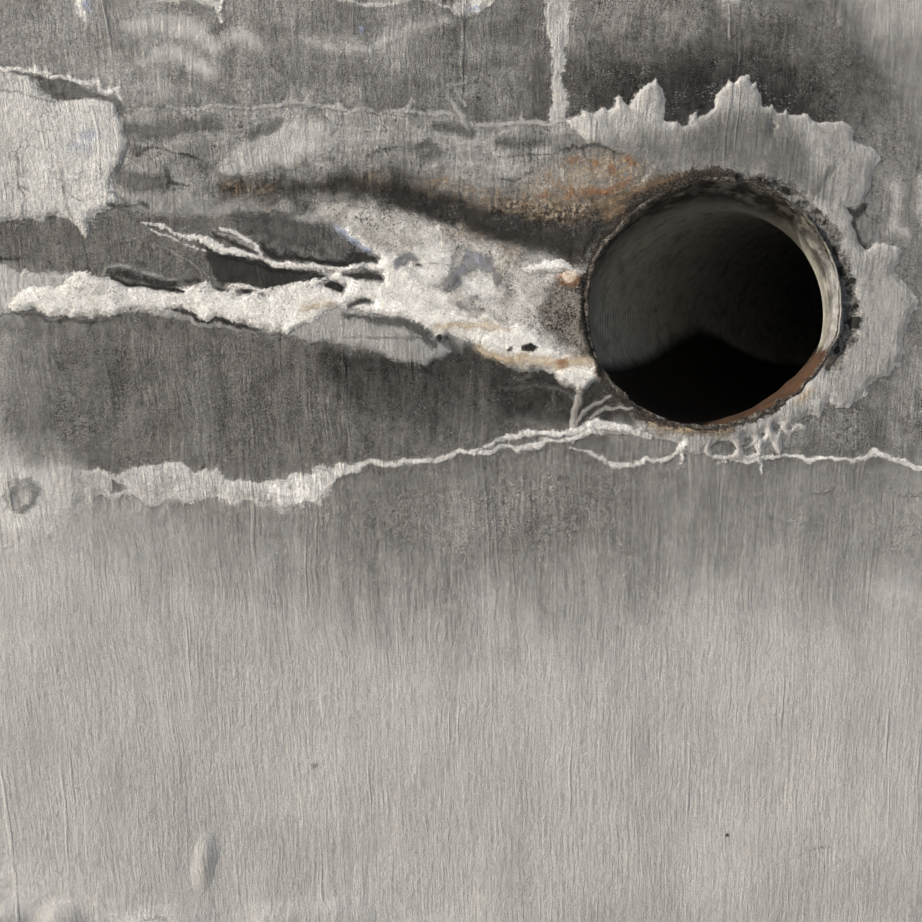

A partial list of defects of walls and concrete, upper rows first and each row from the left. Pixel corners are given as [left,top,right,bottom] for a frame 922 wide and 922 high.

peeling [0,63,129,238]
damp [0,171,687,572]
damp [0,0,922,480]
rust [426,153,710,224]
spalling [737,173,862,373]
spalling [847,203,873,248]